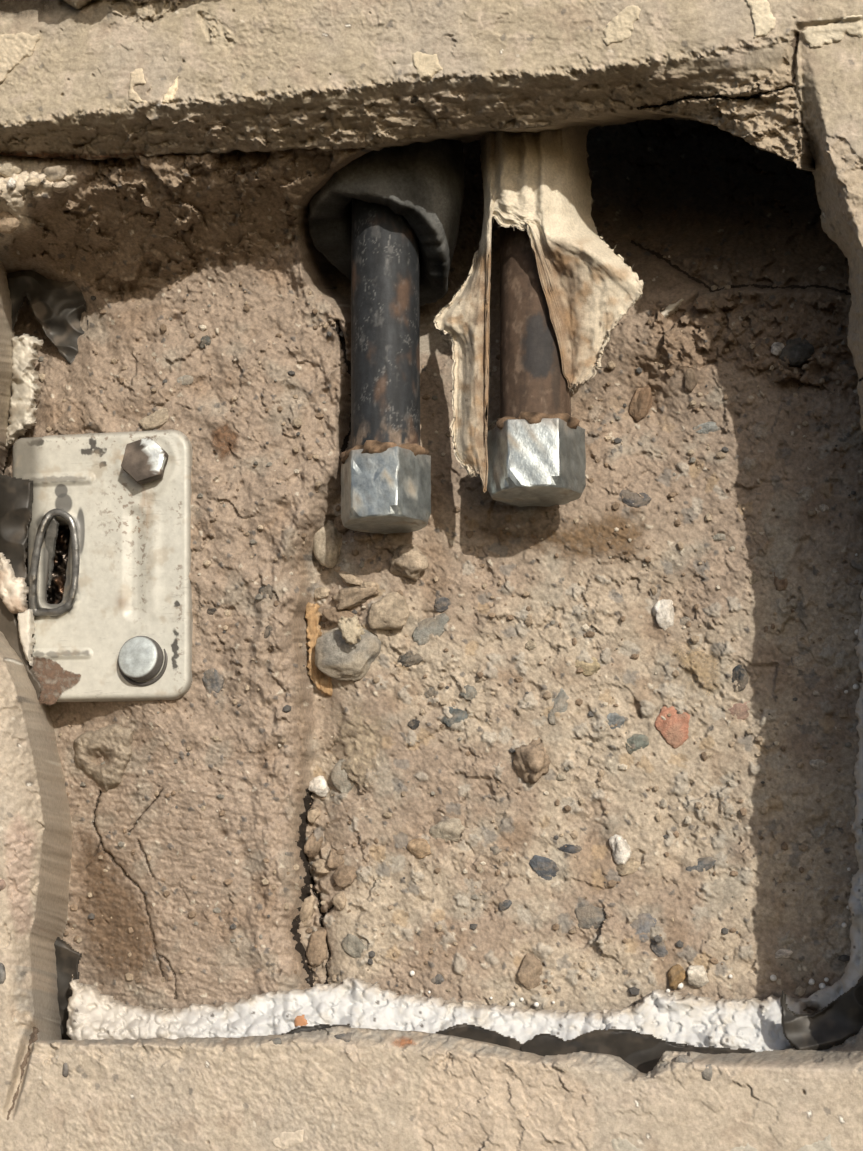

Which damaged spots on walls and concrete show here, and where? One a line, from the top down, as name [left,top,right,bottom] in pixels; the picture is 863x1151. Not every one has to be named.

crack [637,85,792,110]
rust [495,411,580,430]
crack [86,789,177,999]
crack [290,788,334,987]